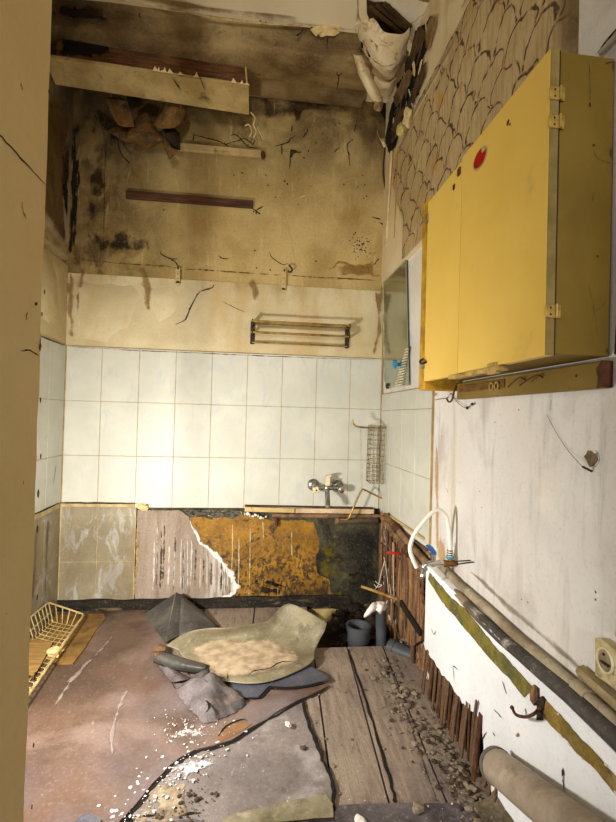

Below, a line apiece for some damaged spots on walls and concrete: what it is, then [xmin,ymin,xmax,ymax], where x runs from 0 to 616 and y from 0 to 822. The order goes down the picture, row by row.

water stain [52,5,129,20]
water stain [152,0,223,12]
water stain [379,0,429,23]
peeling [353,0,437,153]
crack [0,135,53,184]
water stain [45,102,80,253]
water stain [89,167,104,215]
water stain [94,234,148,251]
crack [62,150,379,325]
peeling [135,503,332,599]